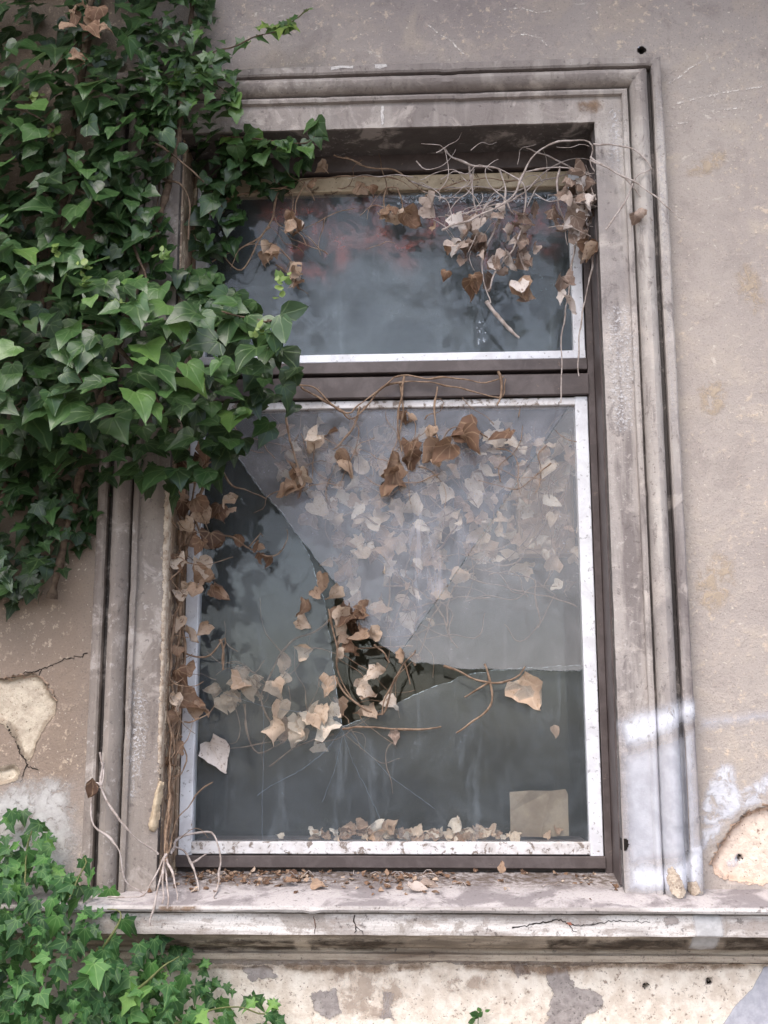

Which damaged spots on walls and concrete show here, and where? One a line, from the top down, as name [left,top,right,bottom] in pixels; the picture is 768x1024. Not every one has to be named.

crack [5,652,88,679]
crack [2,724,38,803]
spalling [0,673,57,785]
water stain [629,740,768,889]
spalling [709,803,768,887]
crack [512,919,647,932]
peeling [140,962,768,1024]